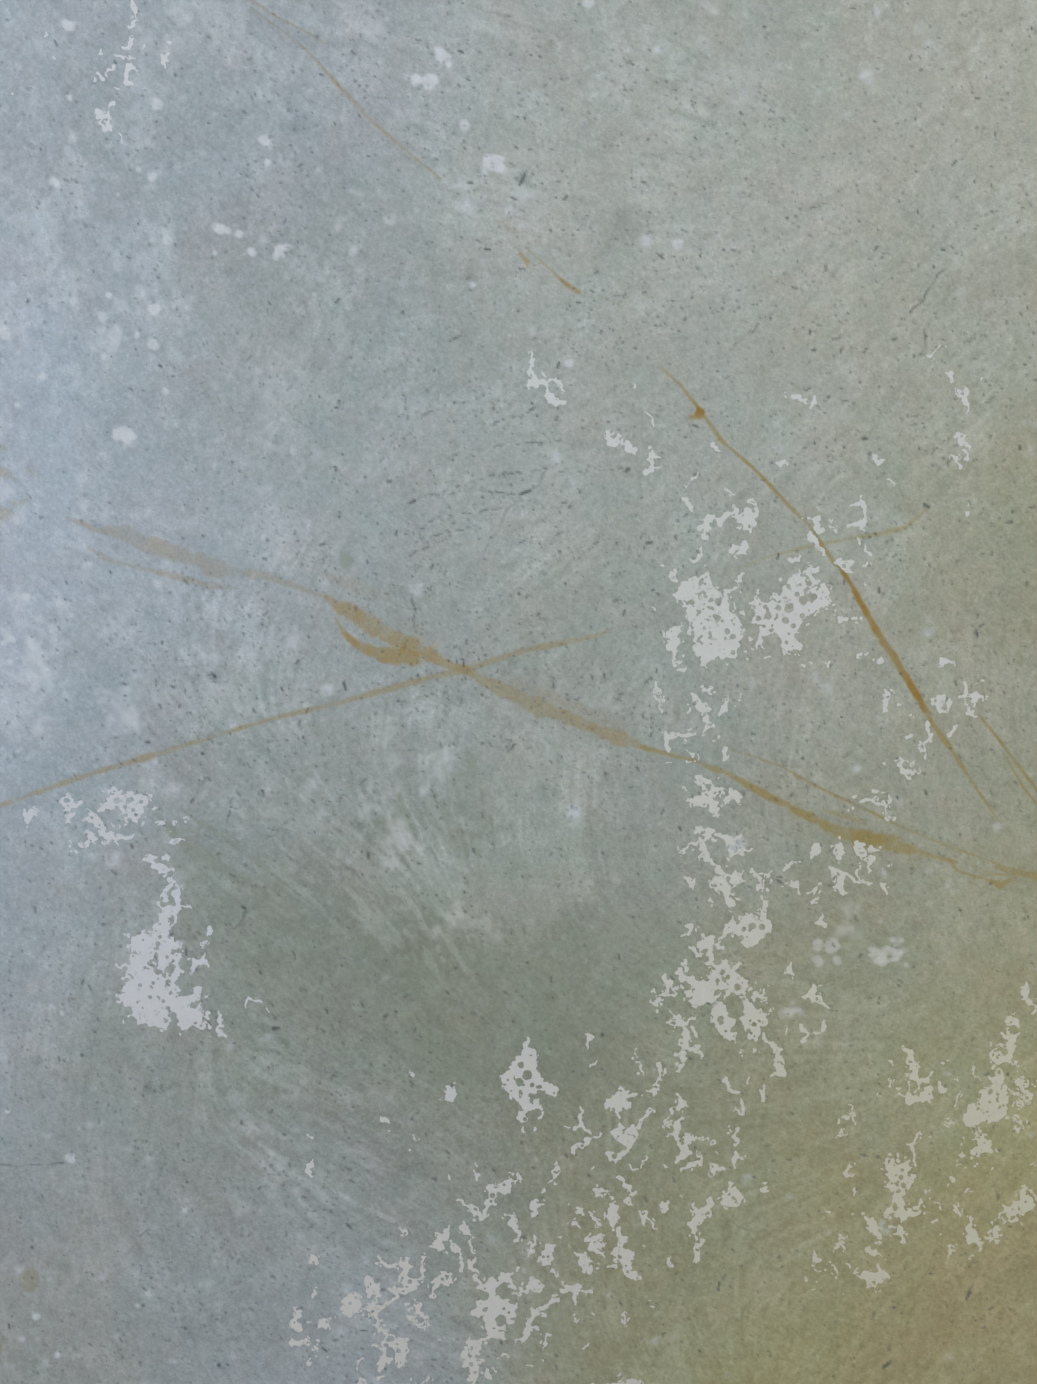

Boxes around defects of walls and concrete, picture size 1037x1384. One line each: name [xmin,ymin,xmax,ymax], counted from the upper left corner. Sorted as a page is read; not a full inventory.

peeling [604,411,662,476]
crack [409,594,418,634]
peeling [660,472,872,673]
peeling [23,806,39,828]
peeling [59,786,227,1038]
peeling [289,681,896,1384]
peeling [804,981,1037,1295]